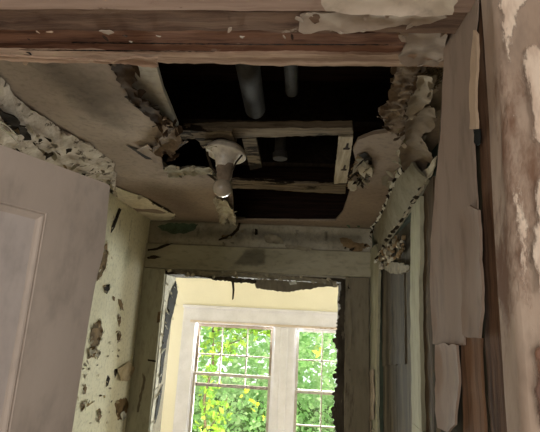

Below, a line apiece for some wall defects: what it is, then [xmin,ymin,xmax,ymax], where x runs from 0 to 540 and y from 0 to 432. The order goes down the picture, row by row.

peeling [498,0,526,60]
spalling [0,108,32,145]
peeling [523,45,540,143]
peeling [295,0,485,432]
peeling [513,179,540,290]
peeling [97,241,124,343]
spalling [77,319,105,411]
spalling [109,397,130,421]
peeling [150,269,352,432]